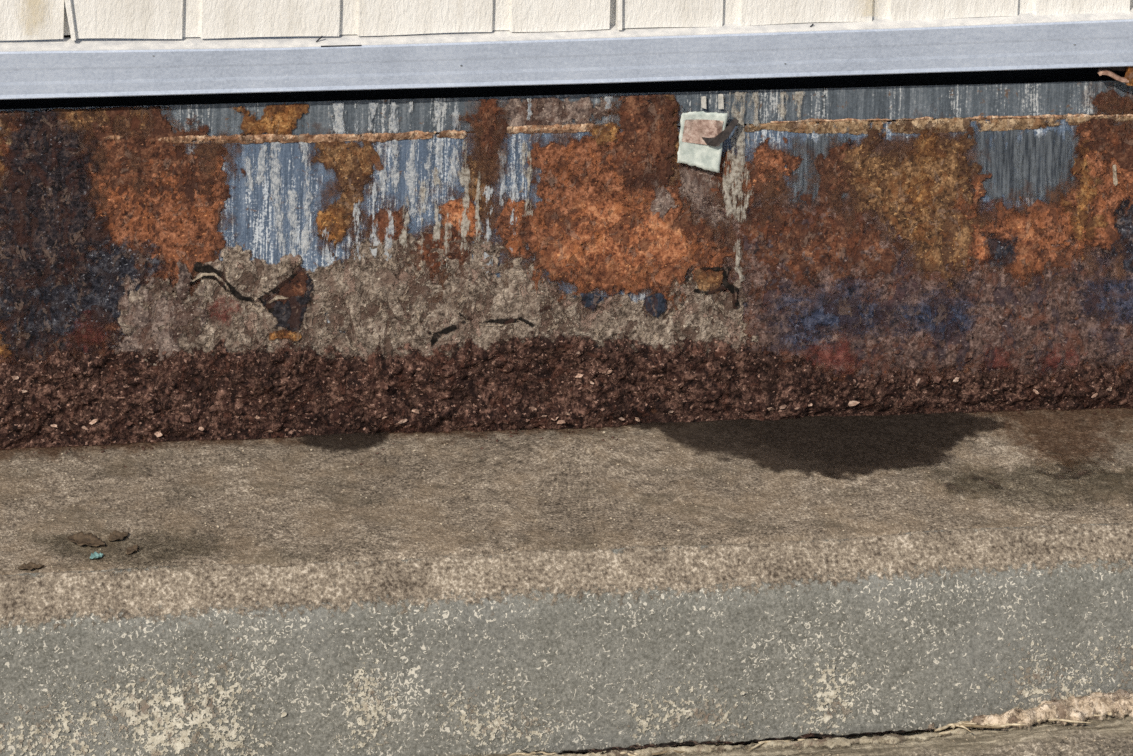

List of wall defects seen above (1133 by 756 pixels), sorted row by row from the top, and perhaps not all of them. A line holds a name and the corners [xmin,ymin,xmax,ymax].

rust [0,315,145,400]
rust [0,103,309,297]
crack [188,261,298,313]
spalling [111,231,759,371]
crack [419,306,552,347]
rust [311,89,1133,346]